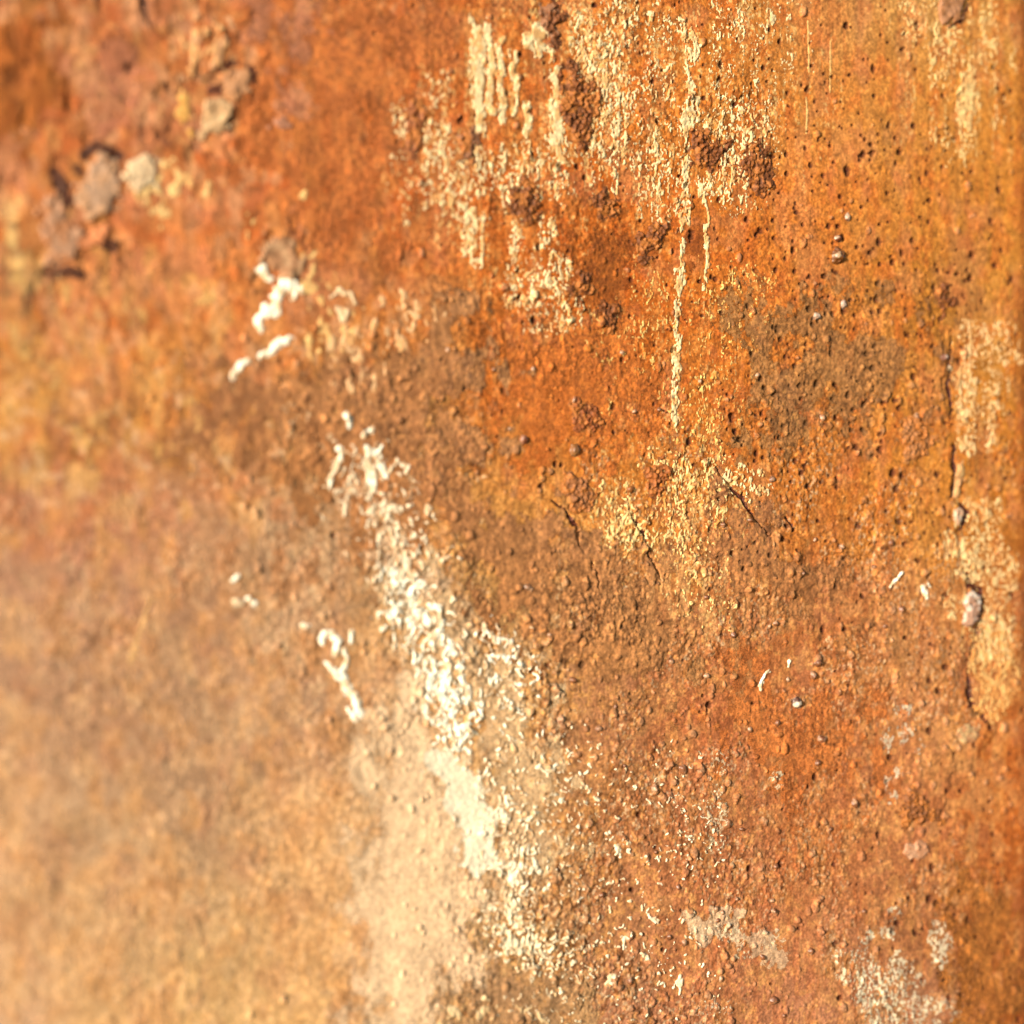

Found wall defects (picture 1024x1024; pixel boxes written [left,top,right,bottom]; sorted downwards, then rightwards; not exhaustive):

peeling [37,150,214,271]
peeling [175,7,253,142]
corrosion [180,0,483,288]
corrosion [538,0,607,154]
corrosion [686,125,779,199]
efflorescence [230,264,304,381]
corrosion [467,186,707,514]
crack [551,500,578,527]
crack [630,514,662,581]
damp [299,411,789,1024]
corrosion [674,628,947,836]
efflorescence [830,906,961,1024]